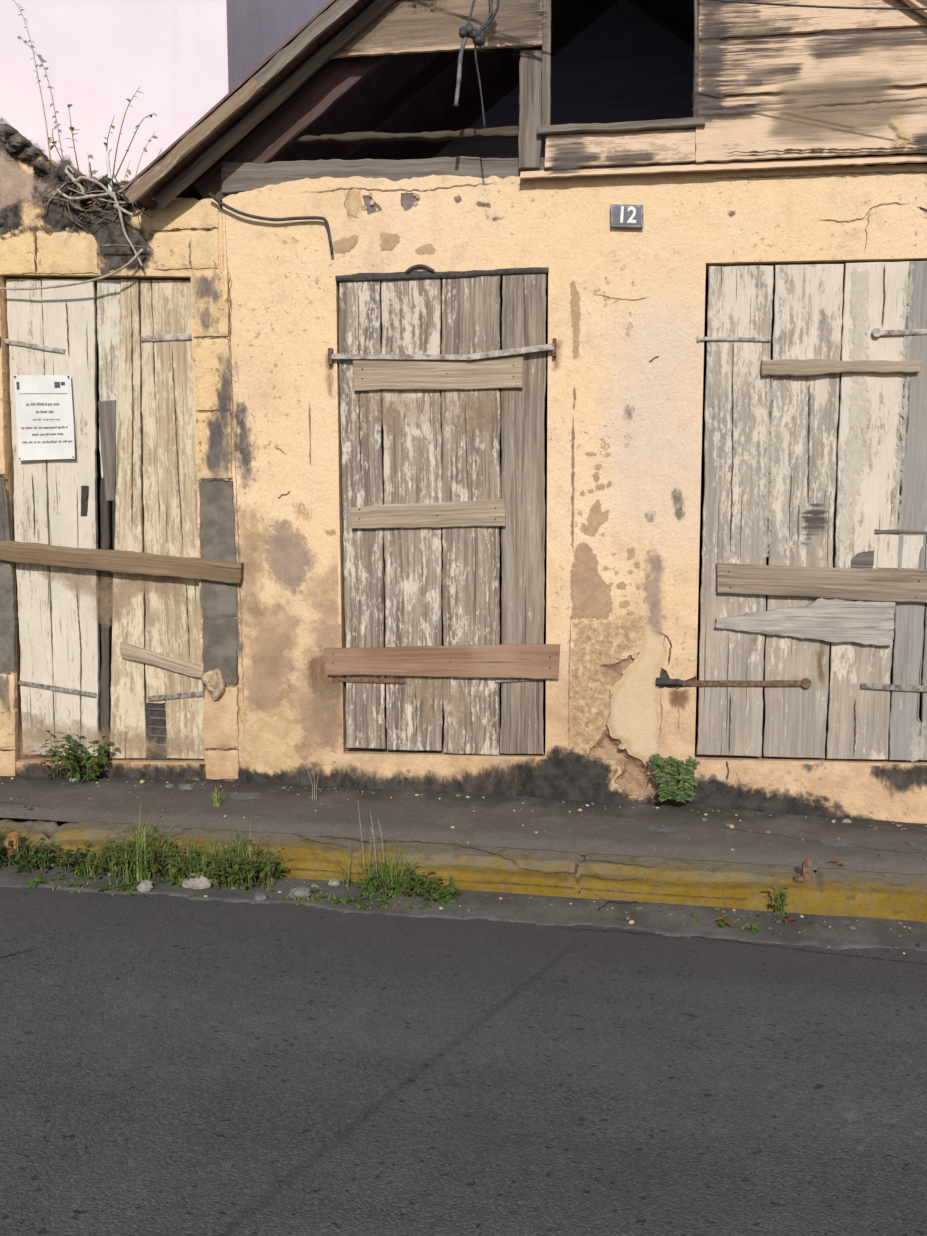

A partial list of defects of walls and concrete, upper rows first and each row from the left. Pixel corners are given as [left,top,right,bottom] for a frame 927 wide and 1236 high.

peeling [0,149,55,211]
crack [712,146,927,251]
peeling [569,452,659,800]
water stain [15,747,870,819]
water stain [872,764,927,791]